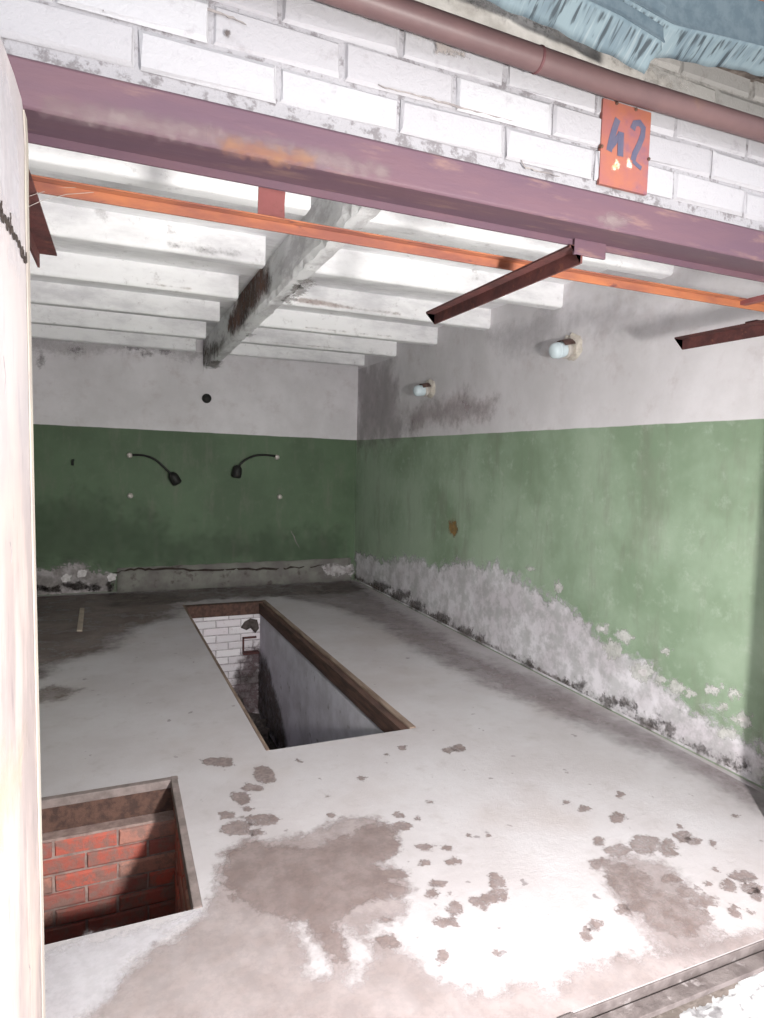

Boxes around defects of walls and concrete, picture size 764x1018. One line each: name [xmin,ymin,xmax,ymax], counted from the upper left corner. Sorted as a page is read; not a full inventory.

peeling [36,561,117,595]
damp [36,576,752,791]
peeling [322,553,764,786]
damp [45,766,764,1018]